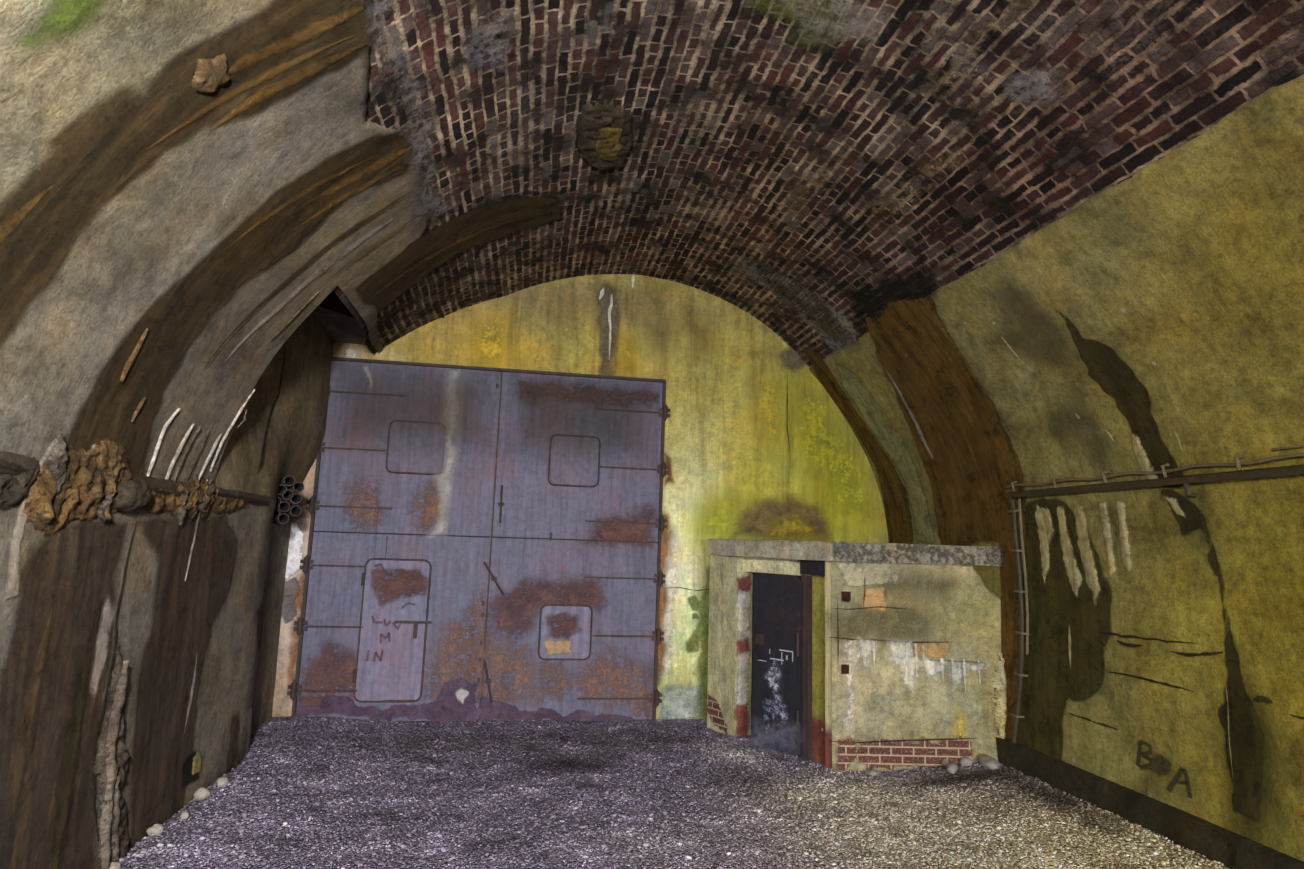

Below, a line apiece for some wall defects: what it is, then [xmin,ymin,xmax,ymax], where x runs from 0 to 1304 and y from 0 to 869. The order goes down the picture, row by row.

leakage [0,0,377,342]
leakage [0,130,421,869]
rust [288,574,358,695]
rust [371,569,428,605]
leakage [437,371,459,531]
leakage [356,196,563,311]
rust [425,509,670,705]
rust [519,382,659,406]
leakage [598,284,629,376]
leakage [781,298,1133,761]
leakage [994,286,1273,843]
spalling [835,736,973,772]